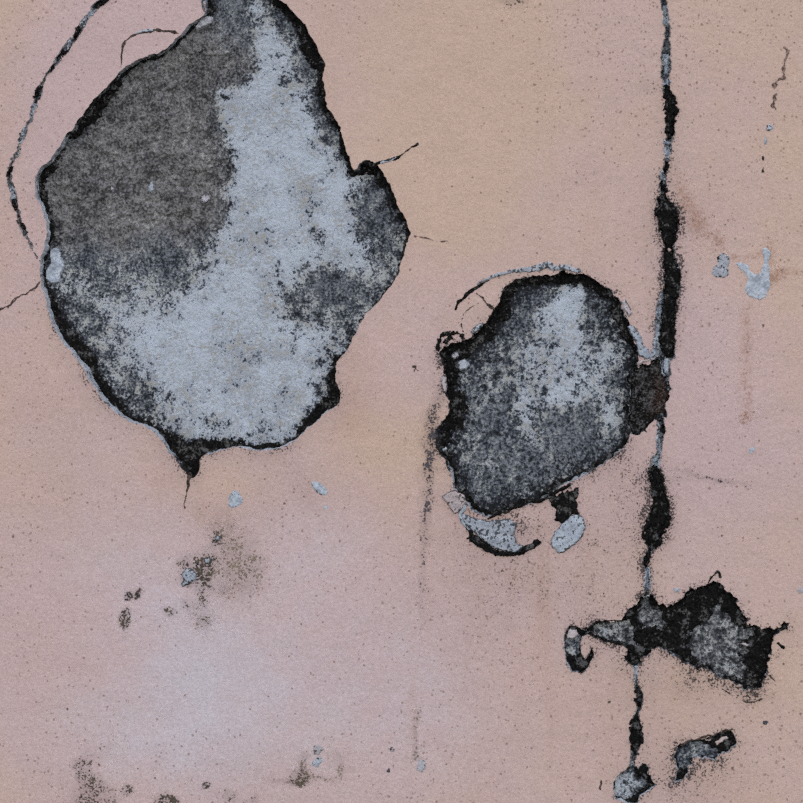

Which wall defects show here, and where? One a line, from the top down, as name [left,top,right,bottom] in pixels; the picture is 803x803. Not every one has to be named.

crack [121,28,179,64]
crack [0,0,109,310]
crack [364,142,419,167]
flaking render [35,0,411,478]
crack [642,0,682,597]
peeling [712,247,771,300]
flaking render [435,261,650,557]
flaking render [564,570,789,703]
flaking render [613,761,656,803]
crack [629,665,644,767]
flaking render [673,728,737,783]